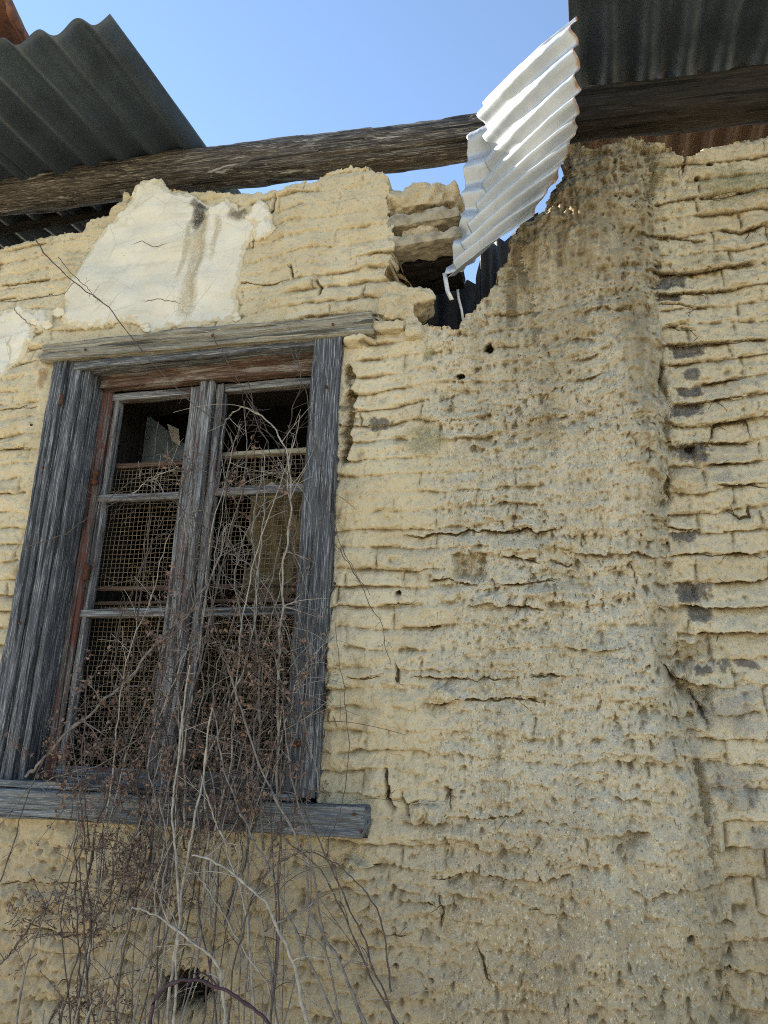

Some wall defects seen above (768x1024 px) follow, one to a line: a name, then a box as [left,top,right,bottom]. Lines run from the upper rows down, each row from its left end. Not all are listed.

water stain [191,200,205,226]
peeling [0,178,276,381]
crack [690,691,707,721]
crack [384,769,454,825]